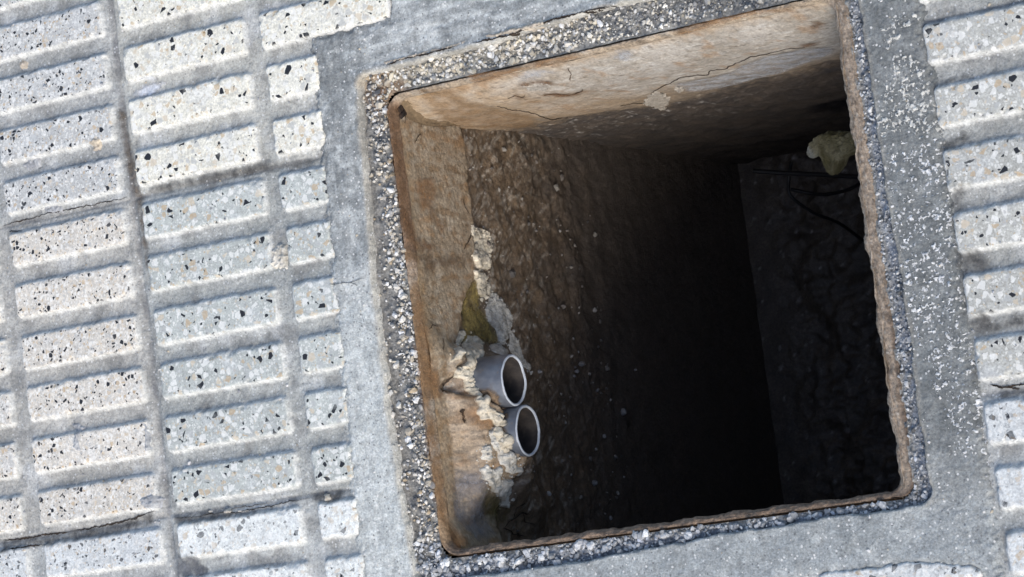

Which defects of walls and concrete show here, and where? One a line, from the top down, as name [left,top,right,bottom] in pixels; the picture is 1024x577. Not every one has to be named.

crack [497,69,583,120]
crack [622,47,805,108]
crack [7,198,123,232]
spalling [384,0,914,557]
crack [6,511,153,550]
crack [191,498,310,518]